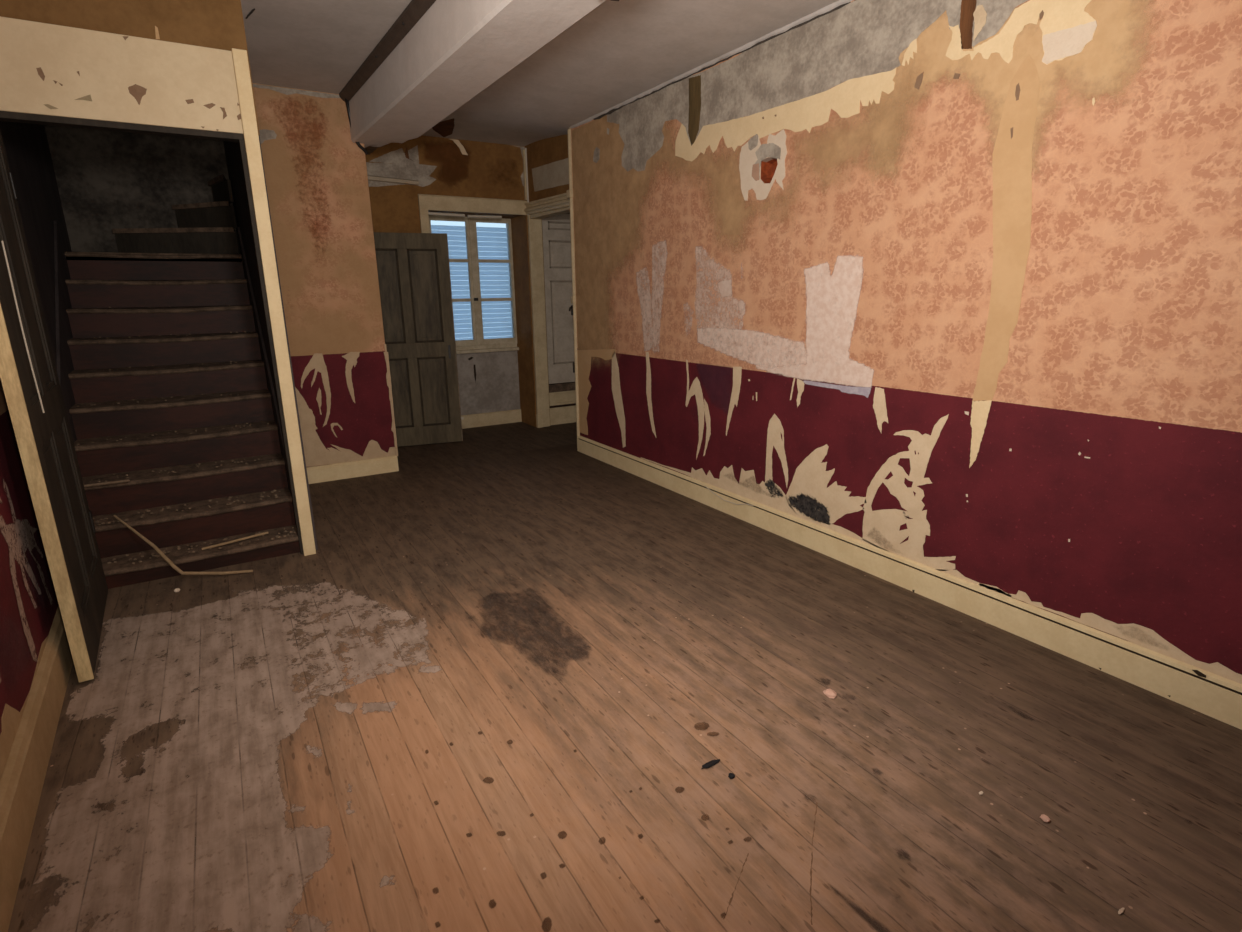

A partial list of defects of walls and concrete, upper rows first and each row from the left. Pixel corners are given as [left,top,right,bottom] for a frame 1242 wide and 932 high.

peeling [1042,21,1097,64]
peeling [128,84,147,105]
peeling [186,99,241,131]
spalling [432,118,454,137]
flaking render [607,0,1028,201]
flaking render [366,145,437,187]
peeling [295,352,398,467]
peeling [577,349,626,447]
peeling [641,352,1242,684]